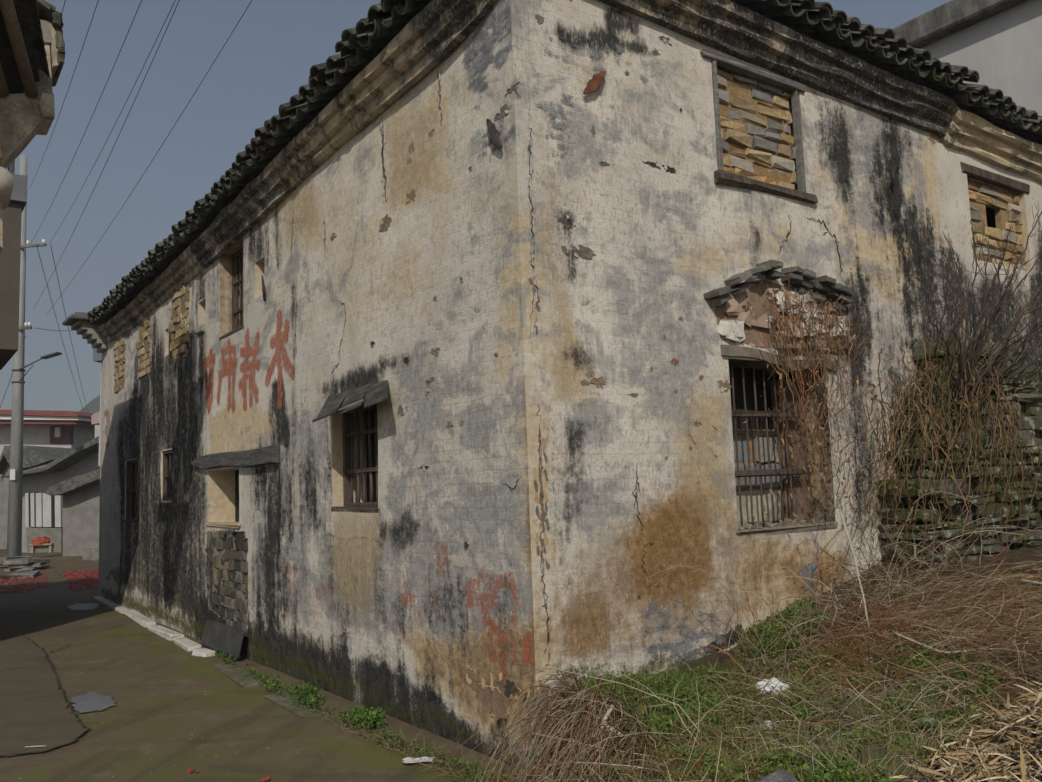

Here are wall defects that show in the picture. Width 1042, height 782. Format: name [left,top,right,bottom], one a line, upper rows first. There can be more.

crack [435,66,443,124]
crack [378,117,387,202]
water stain [822,111,854,212]
spalling [379,214,391,232]
crack [526,97,540,337]
water stain [550,211,576,279]
water stain [868,118,1042,404]
spalling [715,280,849,359]
water stain [843,275,872,441]
water stain [115,272,521,769]